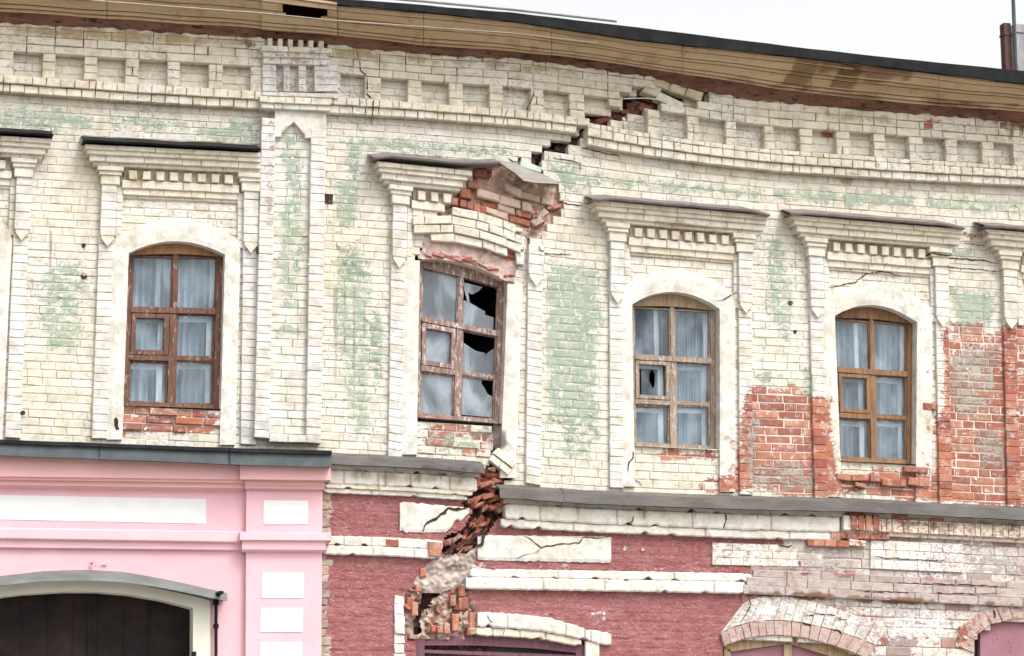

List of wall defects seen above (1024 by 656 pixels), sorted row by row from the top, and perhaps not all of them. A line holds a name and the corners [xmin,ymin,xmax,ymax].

crack [829,243,1006,288]
spalling [325,135,1023,467]
spalling [114,407,220,440]
spalling [692,239,837,493]
spalling [836,403,938,498]
peeling [949,282,1024,507]
crack [422,416,510,558]
crack [516,534,605,559]
spalling [724,512,909,577]
crack [410,593,505,656]
peeling [751,599,971,653]